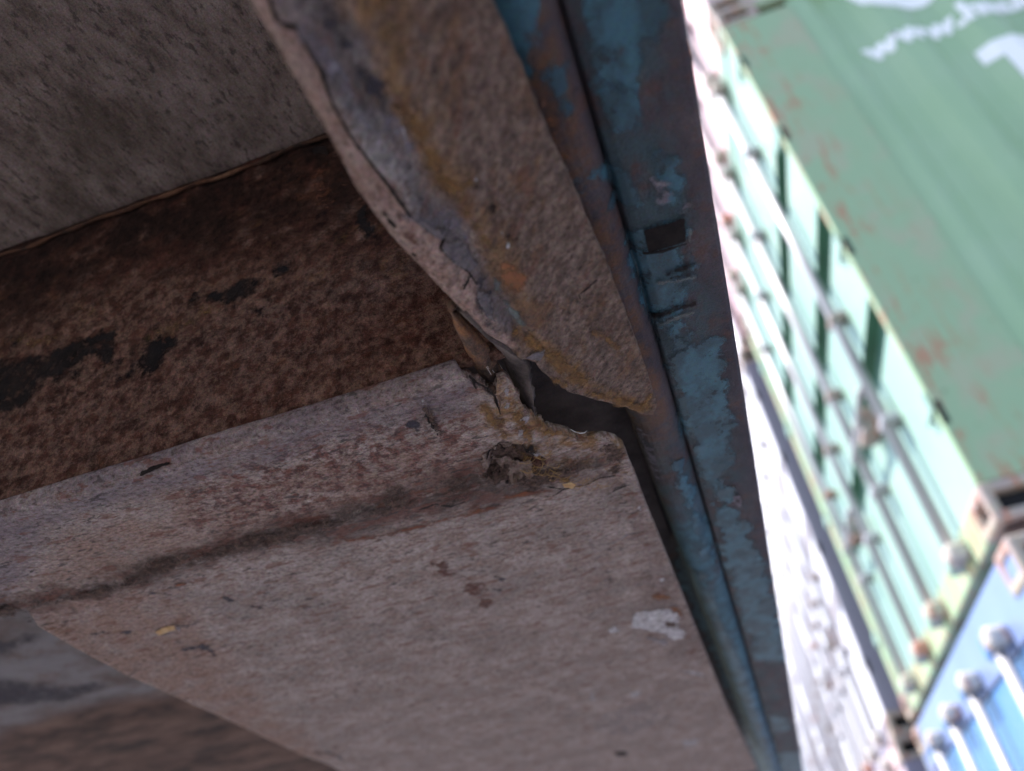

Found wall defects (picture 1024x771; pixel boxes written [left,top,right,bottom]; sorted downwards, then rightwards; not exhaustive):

peeling [493,0,574,117]
peeling [582,0,678,134]
damp [0,325,177,413]
crack [469,375,501,414]
rust [446,300,575,472]
spalling [480,442,546,485]